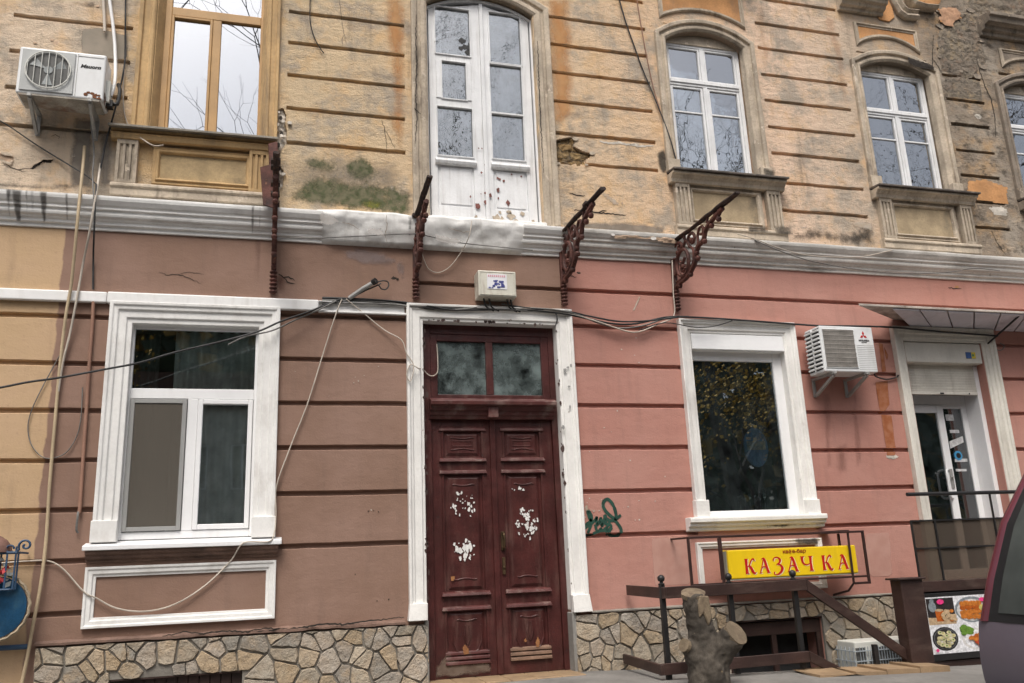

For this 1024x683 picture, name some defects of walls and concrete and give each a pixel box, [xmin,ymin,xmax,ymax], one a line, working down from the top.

spalling [908,0,1024,101]
spalling [556,137,595,166]
damp [7,189,20,219]
peeling [967,179,1008,216]